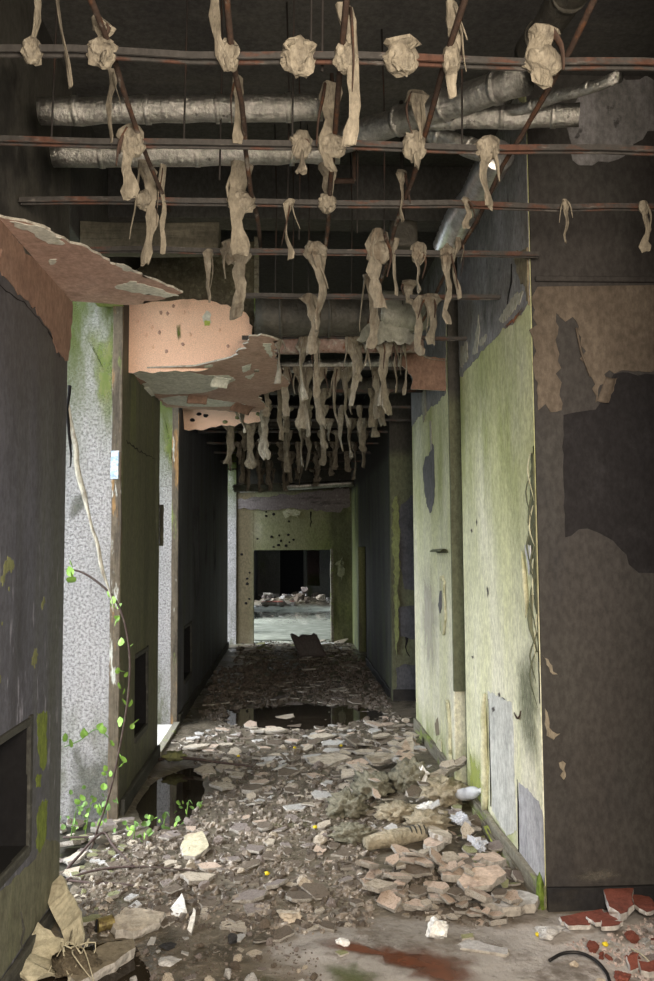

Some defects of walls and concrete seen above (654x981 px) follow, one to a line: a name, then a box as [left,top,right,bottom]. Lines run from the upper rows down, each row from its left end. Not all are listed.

crack [0,285,60,357]
peeling [0,220,73,361]
peeling [115,263,179,298]
peeling [134,364,255,415]
peeling [391,377,447,652]
peeling [413,129,530,377]
peeling [521,446,540,708]
peeling [562,372,654,573]